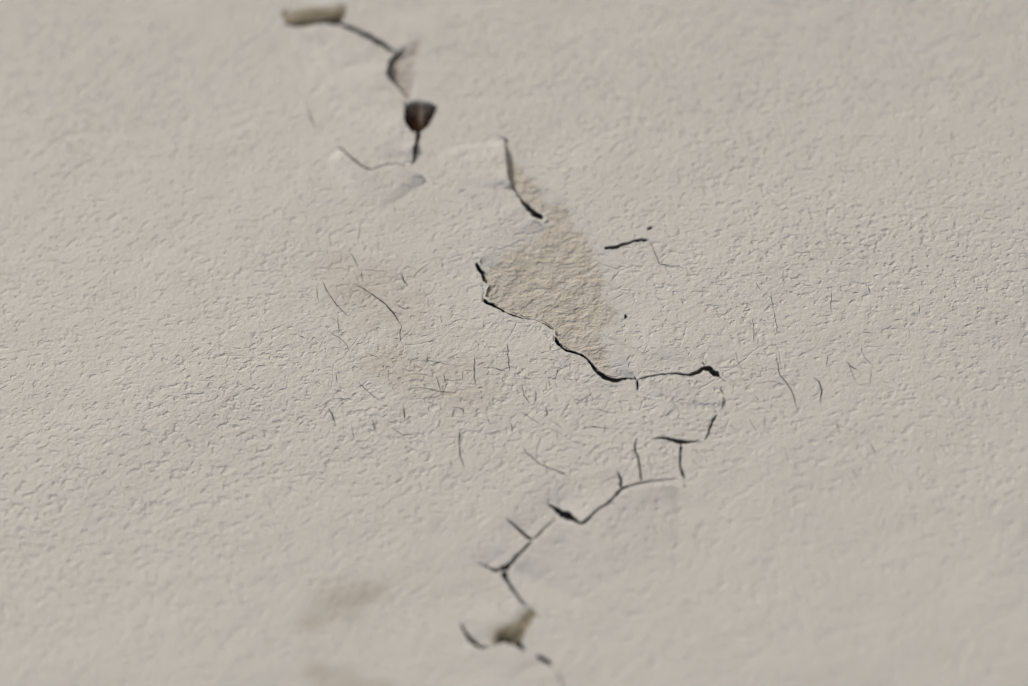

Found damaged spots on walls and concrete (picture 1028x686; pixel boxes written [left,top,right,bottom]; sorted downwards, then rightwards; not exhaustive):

spalling [281,0,347,27]
peeling [386,27,437,145]
crack [317,233,402,347]
peeling [468,138,639,396]
crack [604,227,666,266]
crack [637,286,872,408]
crack [426,355,476,468]
crack [478,416,717,605]
crack [536,655,563,686]